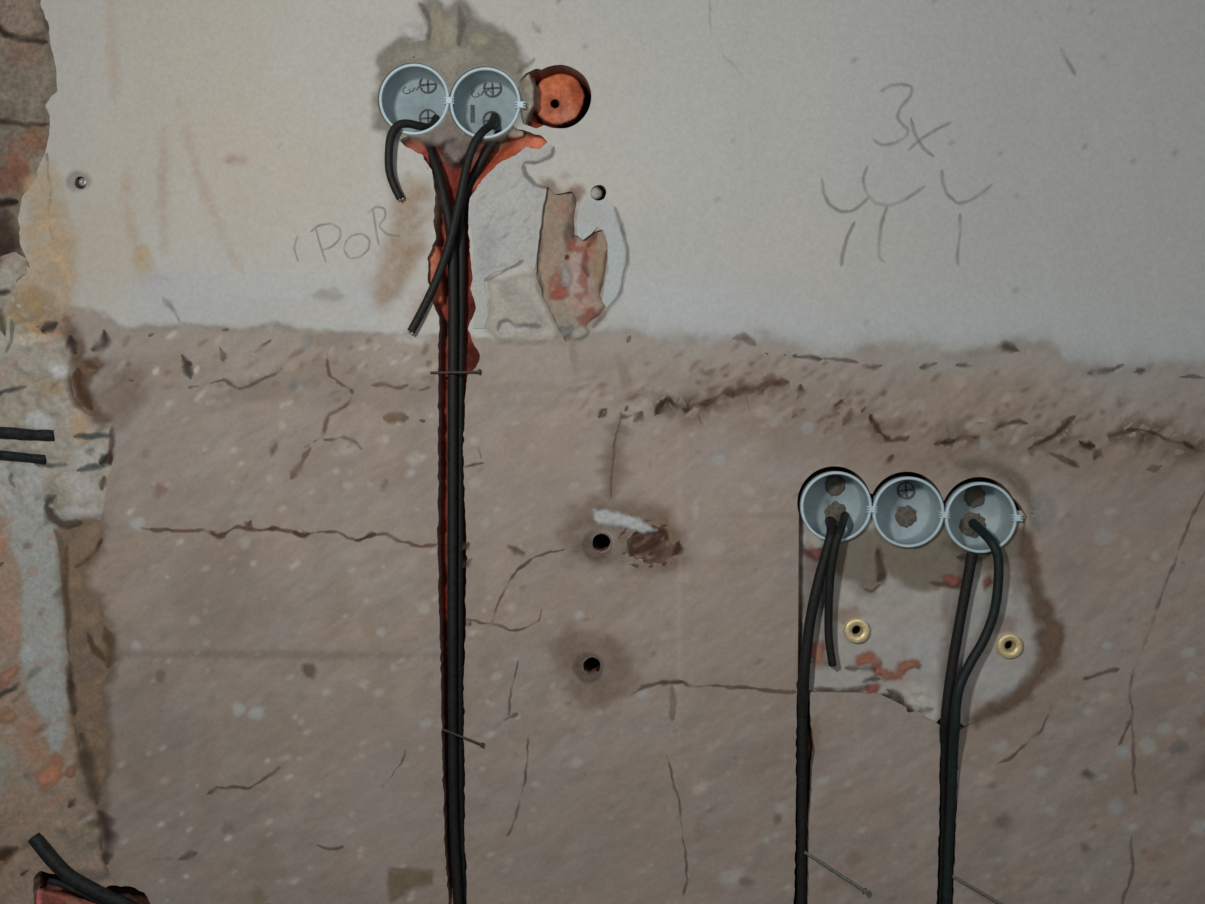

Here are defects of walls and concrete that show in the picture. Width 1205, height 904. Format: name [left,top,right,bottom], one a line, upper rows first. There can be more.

spalling [536,188,608,341]
flaking render [0,0,136,904]
crack [148,521,470,568]
crack [467,547,560,631]
crack [636,681,796,721]
crack [1083,668,1120,679]
crack [1119,704,1136,793]
crack [1122,853,1134,904]